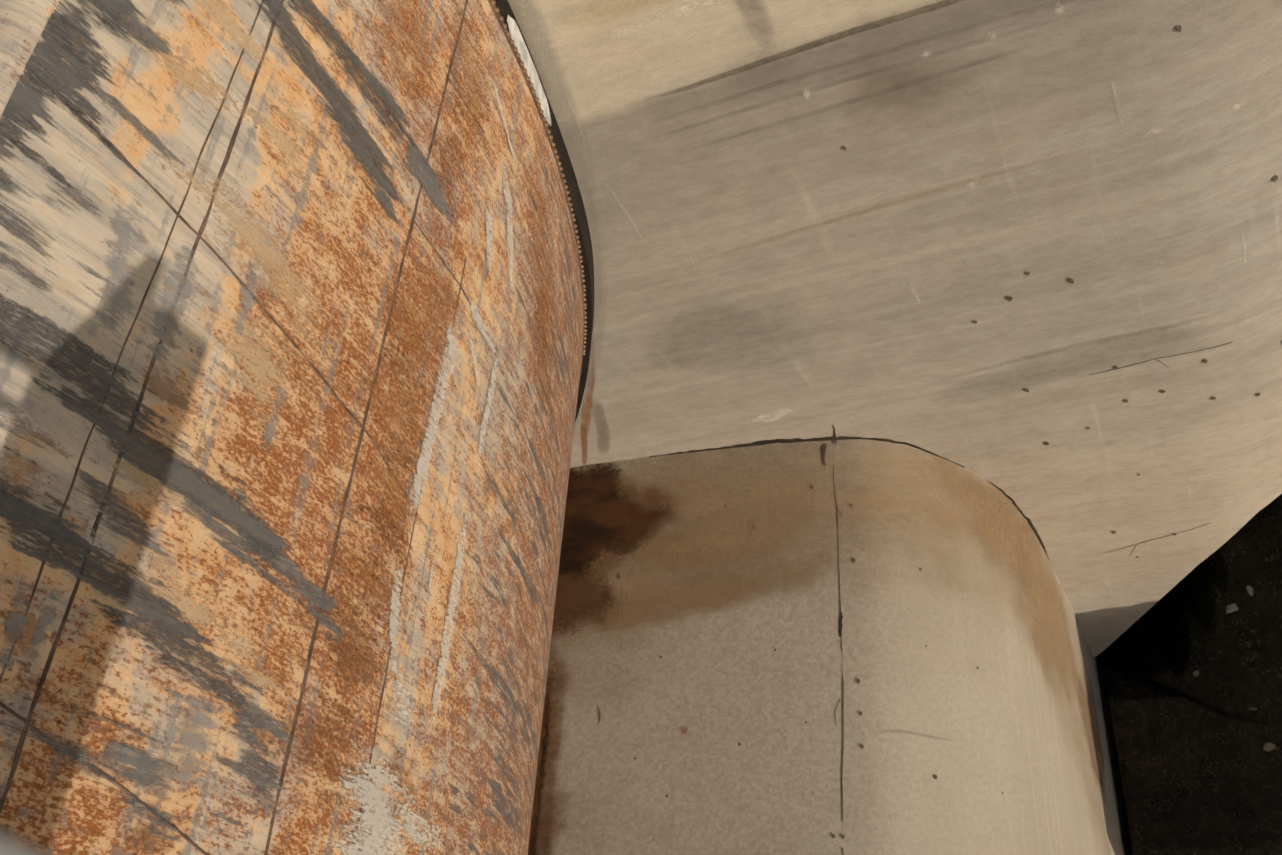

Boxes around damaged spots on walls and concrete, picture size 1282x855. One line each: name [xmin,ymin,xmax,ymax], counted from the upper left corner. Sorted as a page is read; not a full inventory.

water stain [553,456,1030,631]
rust [528,663,562,855]